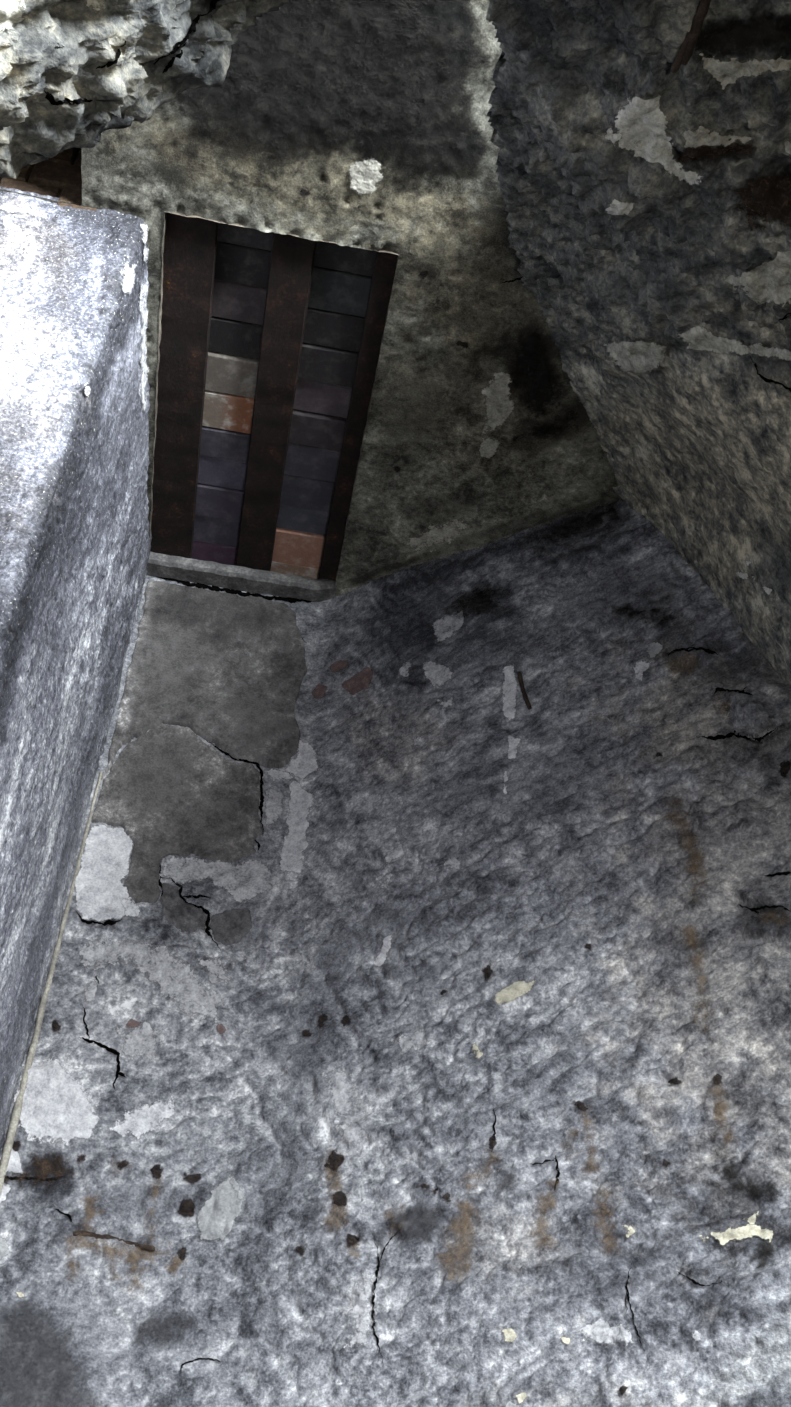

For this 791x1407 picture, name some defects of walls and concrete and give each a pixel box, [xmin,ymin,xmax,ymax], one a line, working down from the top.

crack [44,41,126,105]
crack [154,0,220,73]
spalling [605,95,752,185]
corrosion [678,138,757,169]
corrosion [731,173,791,233]
spalling [724,250,791,307]
crack [205,739,264,850]
spalling [75,825,140,921]
spalling [79,939,231,1023]
corrosion [70,1197,157,1285]
leakage [0,1302,99,1407]
leakage [134,1316,188,1344]